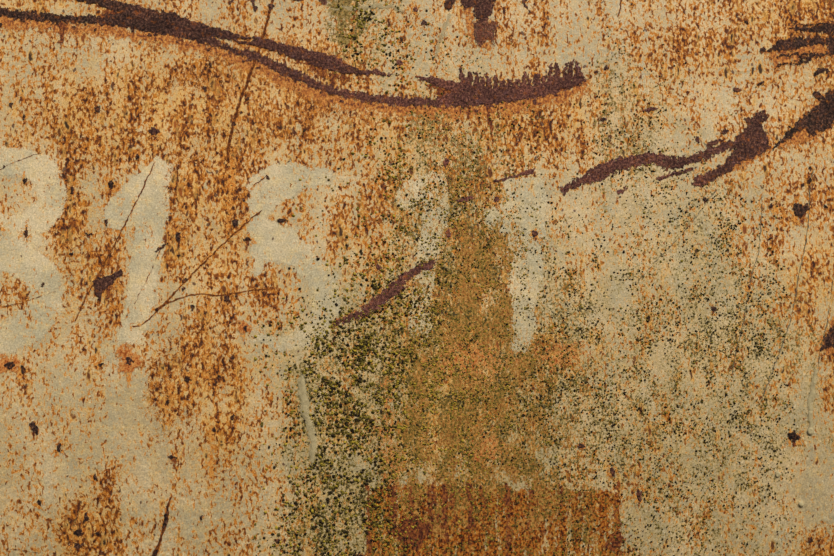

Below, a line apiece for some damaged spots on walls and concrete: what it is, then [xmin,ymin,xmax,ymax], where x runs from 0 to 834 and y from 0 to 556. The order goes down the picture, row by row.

rust [0,0,834,331]
rust [0,354,21,375]
rust [115,300,254,498]
rust [331,130,626,556]
rust [814,317,834,421]
rust [47,468,131,556]
rust [795,517,834,556]